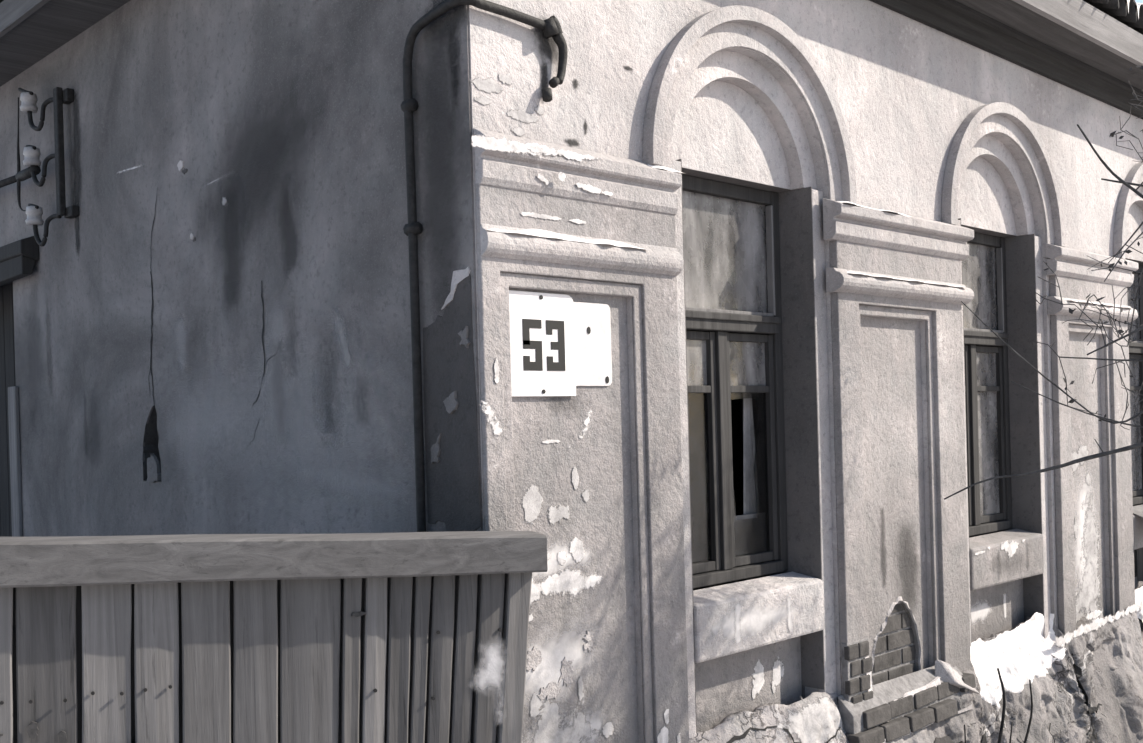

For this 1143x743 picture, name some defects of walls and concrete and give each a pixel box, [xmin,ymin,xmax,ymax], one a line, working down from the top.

peeling [471,105,601,162]
peeling [537,172,613,196]
peeling [520,212,587,224]
crack [148,187,158,400]
crack [244,281,281,452]
spalling [423,267,507,532]
peeling [752,656,784,699]
flaking render [777,596,979,743]
peeling [523,676,614,743]
peeling [657,709,681,743]
crack [727,726,848,743]